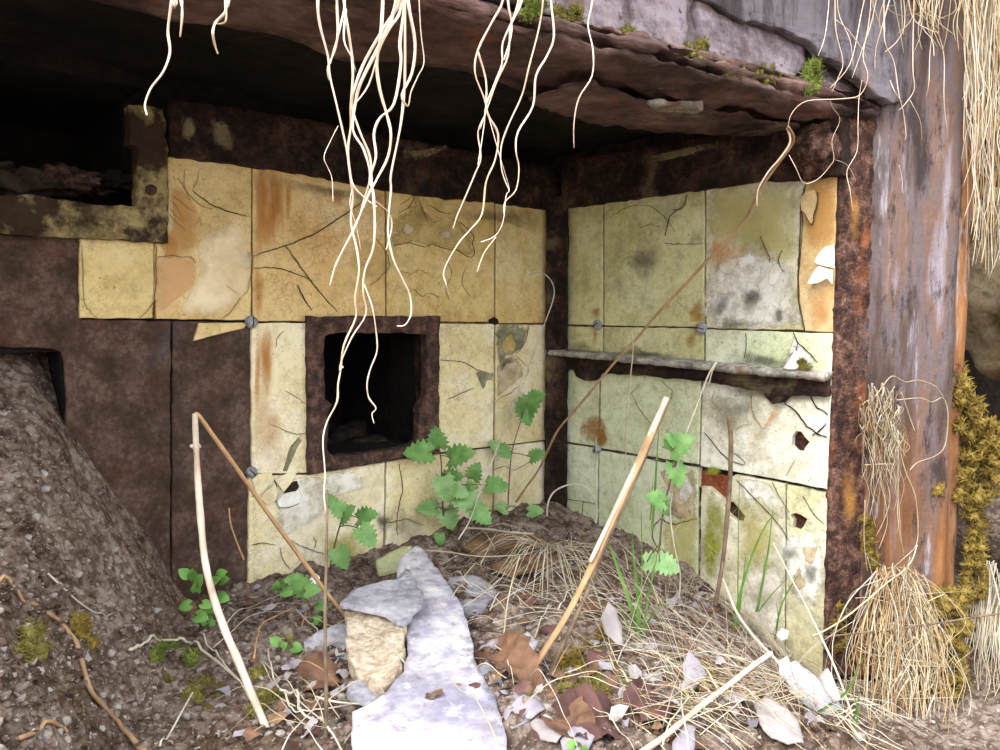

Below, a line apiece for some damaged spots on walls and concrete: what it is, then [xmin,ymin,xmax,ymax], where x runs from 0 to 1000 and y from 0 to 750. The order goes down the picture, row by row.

crack [140,246,196,318]
rust [160,196,194,304]
crack [222,192,372,319]
crack [760,188,818,362]
peeling [807,244,835,284]
rust [256,348,268,389]
spalling [252,438,363,533]
rust [583,419,607,446]
spalling [661,471,745,521]
crack [647,392,828,541]
hole [795,431,809,451]
peeling [741,479,822,635]